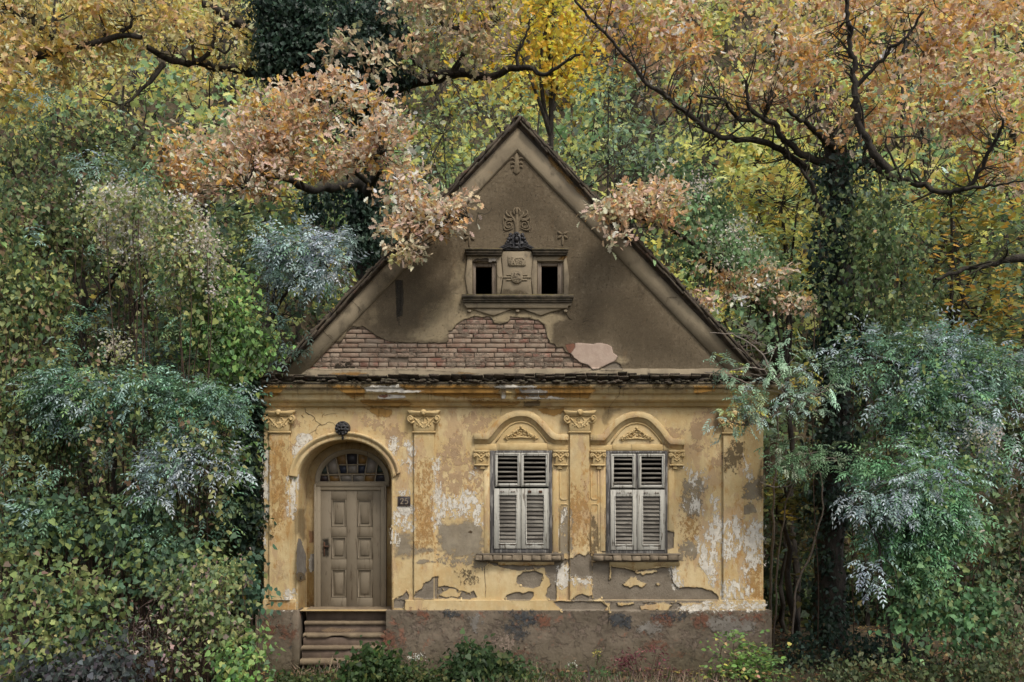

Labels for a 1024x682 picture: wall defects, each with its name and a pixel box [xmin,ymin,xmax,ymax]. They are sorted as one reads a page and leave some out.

flaking render [309,316,623,373]
peeling [364,384,420,399]
spalling [495,385,564,400]
peeling [292,433,313,458]
peeling [388,436,417,474]
peeling [285,475,300,520]
peeling [390,488,416,547]
peeling [431,457,484,533]
spalling [487,463,768,653]